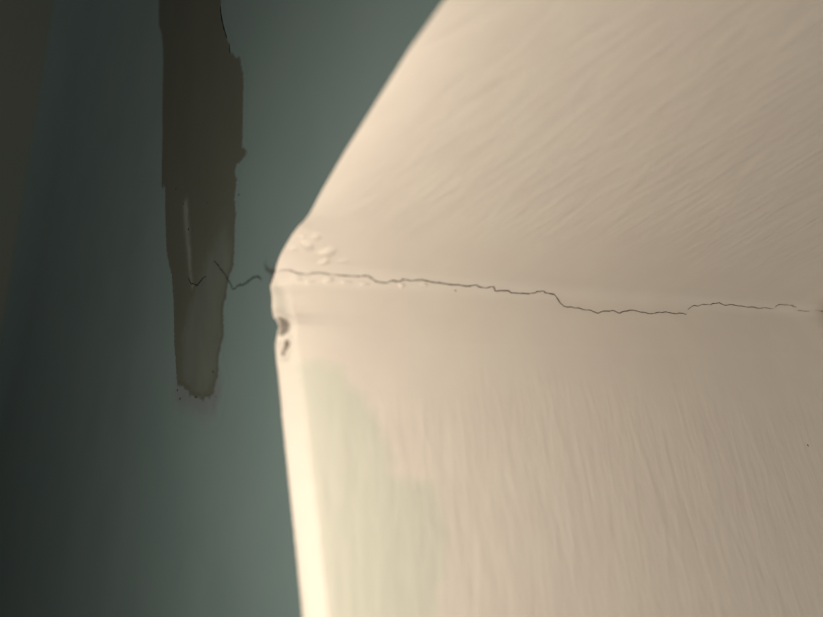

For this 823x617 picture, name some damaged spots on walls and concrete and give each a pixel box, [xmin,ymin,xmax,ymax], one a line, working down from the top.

peeling [157,0,251,435]
crack [188,261,823,315]